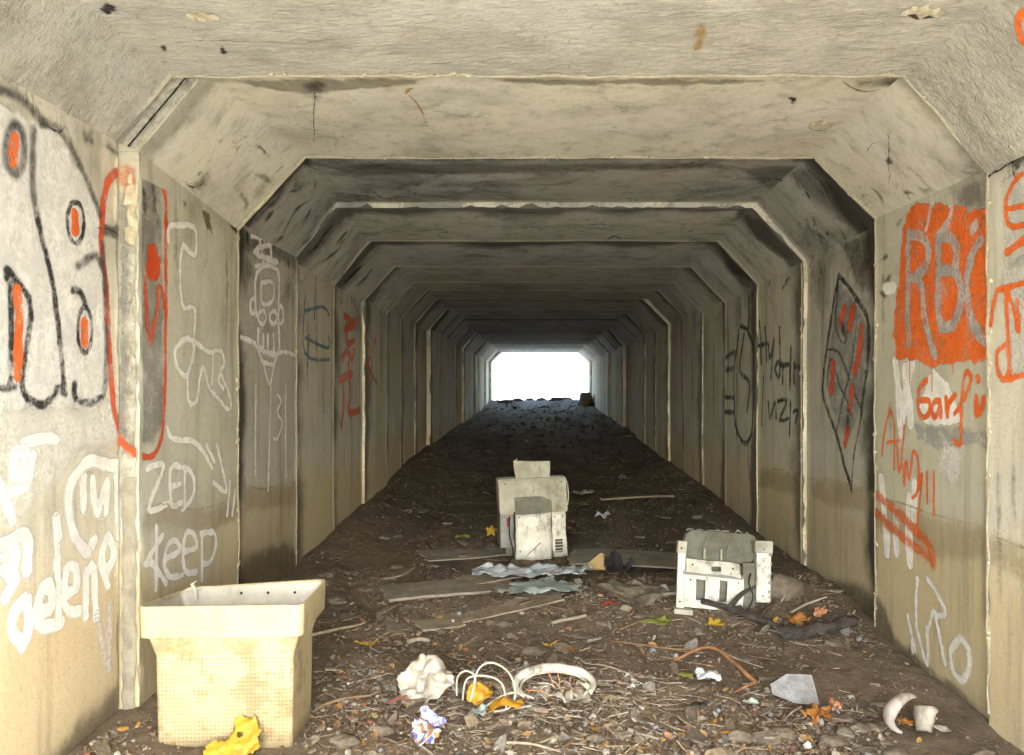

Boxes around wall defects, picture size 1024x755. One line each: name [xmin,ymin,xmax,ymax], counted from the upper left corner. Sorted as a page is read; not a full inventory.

spalling [901,4,945,20]
crack [308,82,324,135]
spalling [119,72,962,151]